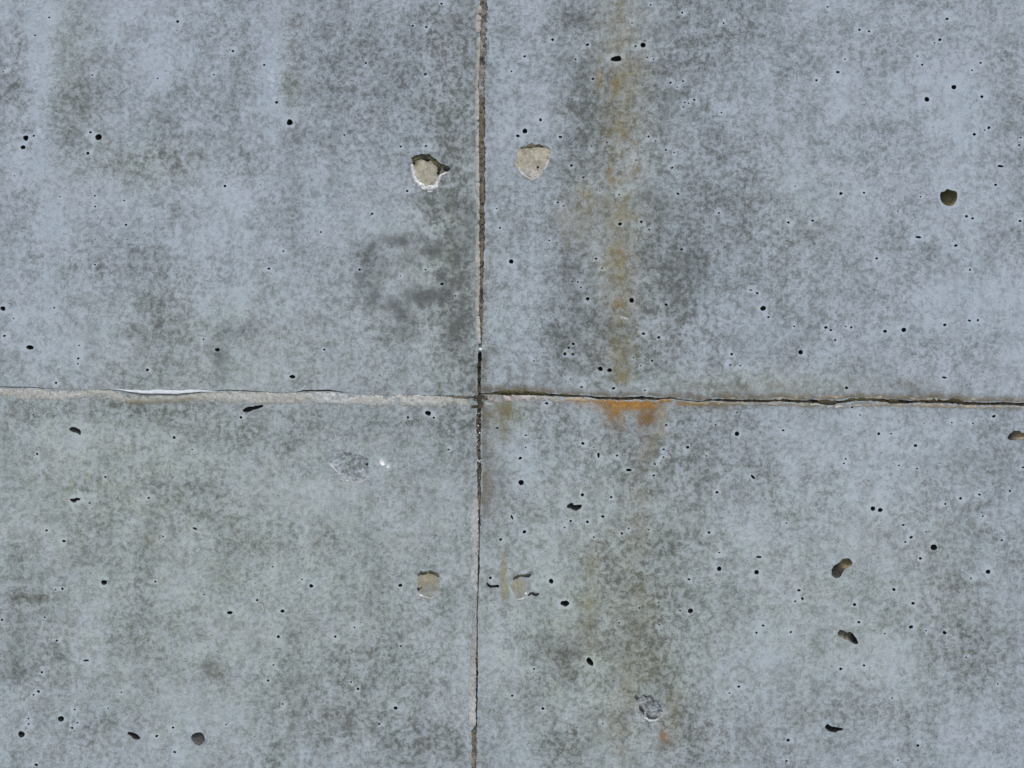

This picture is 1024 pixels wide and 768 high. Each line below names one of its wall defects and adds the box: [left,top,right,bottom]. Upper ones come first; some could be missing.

crack [0,386,140,394]
crack [184,388,382,396]
corrosion [599,399,673,424]
crack [407,351,1024,768]
spalling [634,694,664,722]